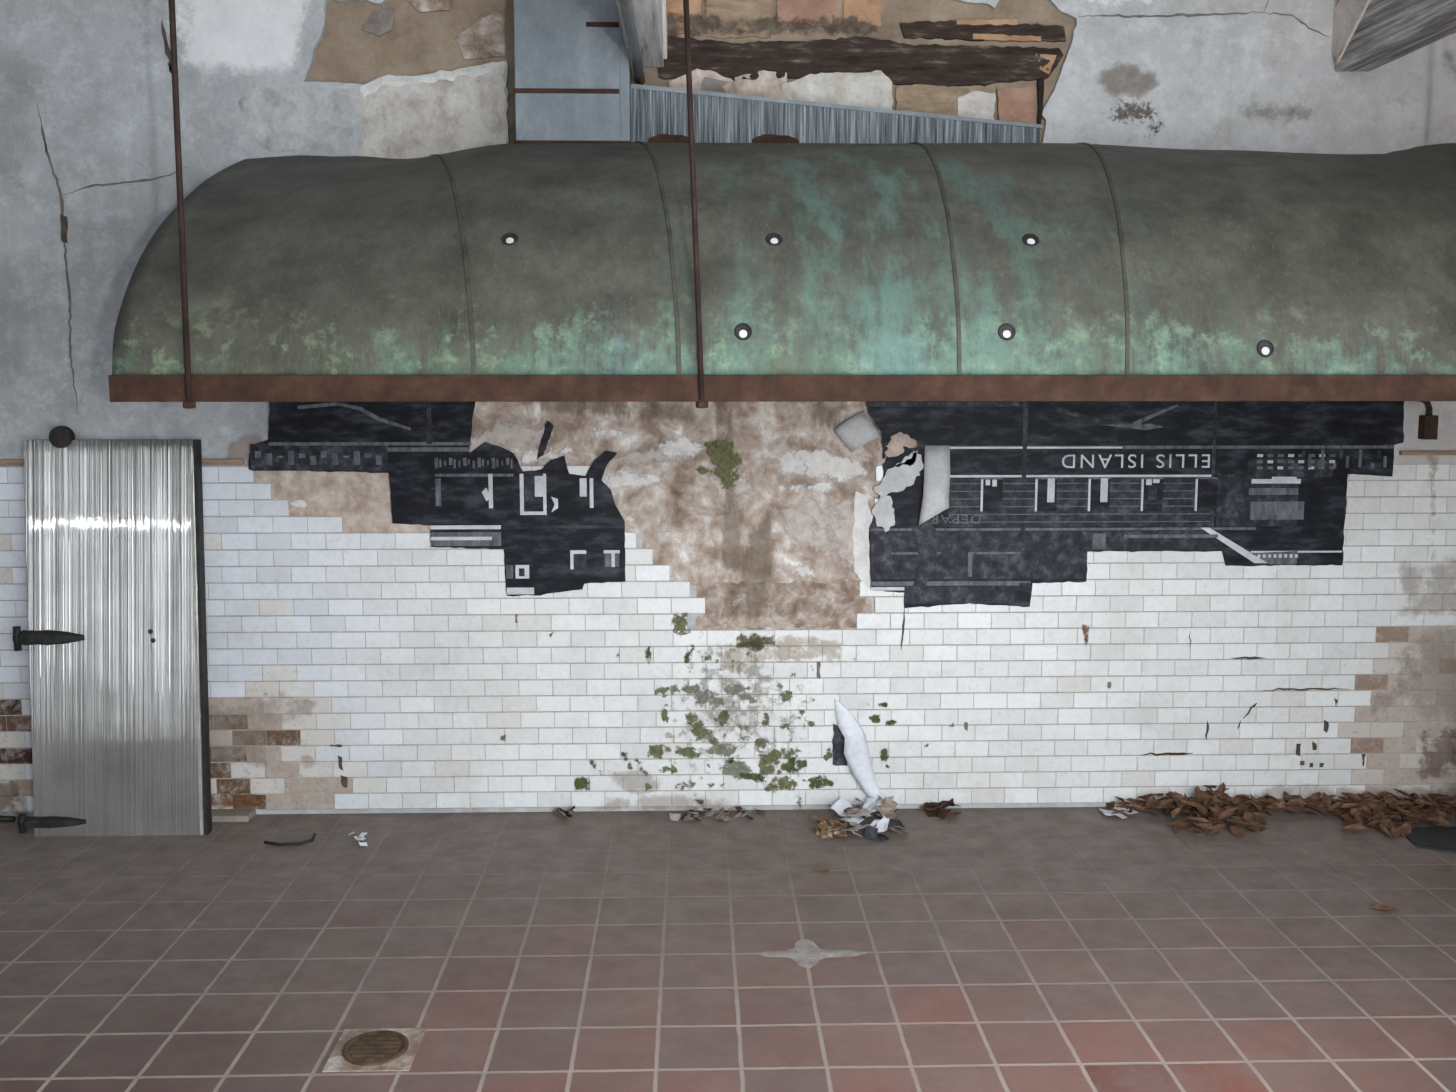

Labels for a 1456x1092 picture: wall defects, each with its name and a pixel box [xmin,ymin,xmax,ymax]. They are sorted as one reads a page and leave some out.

flaking render [307,0,516,143]
flaking render [632,0,1075,143]
crack [36,104,185,412]
peeling [470,401,882,630]
spalling [0,683,33,815]
peeling [330,744,348,788]
peeling [1296,720,1329,767]
damp [1420,730,1456,777]